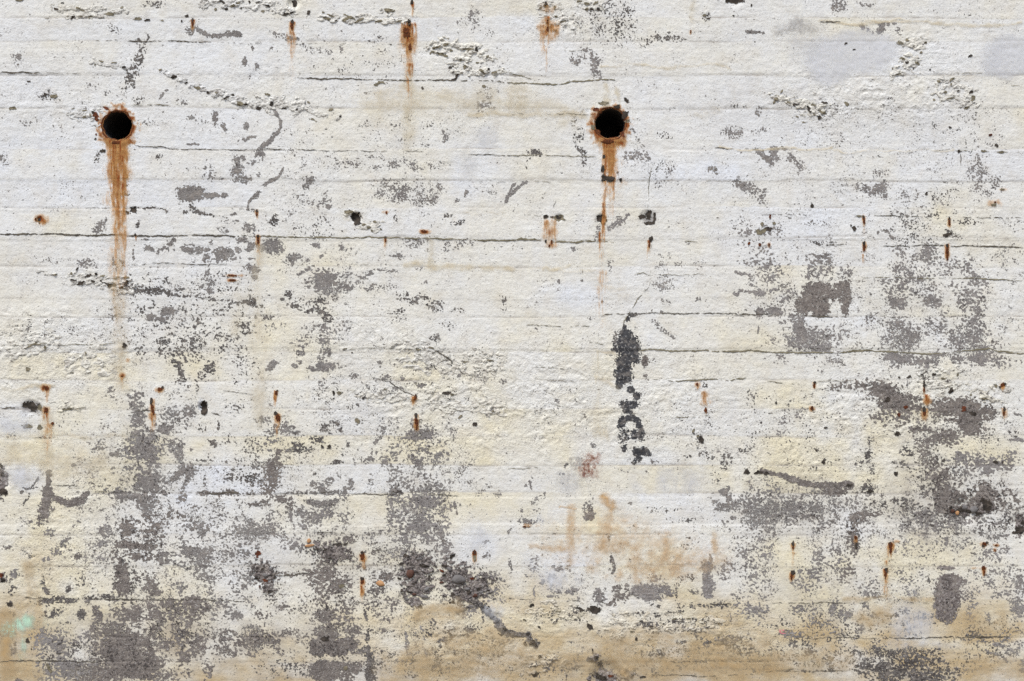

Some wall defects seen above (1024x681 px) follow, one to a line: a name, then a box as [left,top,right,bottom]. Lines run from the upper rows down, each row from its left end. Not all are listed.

corrosion [401,0,416,91]
corrosion [540,2,557,36]
corrosion [96,104,136,239]
corrosion [587,104,631,248]
peeling [729,216,857,374]
peeling [617,376,664,473]